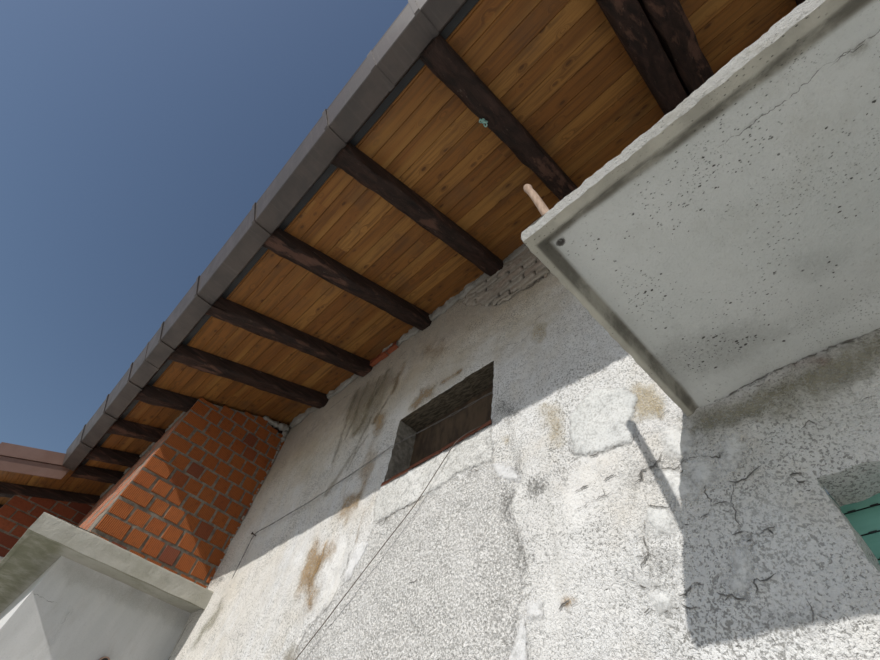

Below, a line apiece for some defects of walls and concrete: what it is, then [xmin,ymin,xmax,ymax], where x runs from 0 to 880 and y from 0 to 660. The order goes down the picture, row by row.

crack [727,72,817,141]
crack [576,474,614,509]
crack [634,451,724,483]
crack [687,465,775,542]
crack [631,505,776,613]